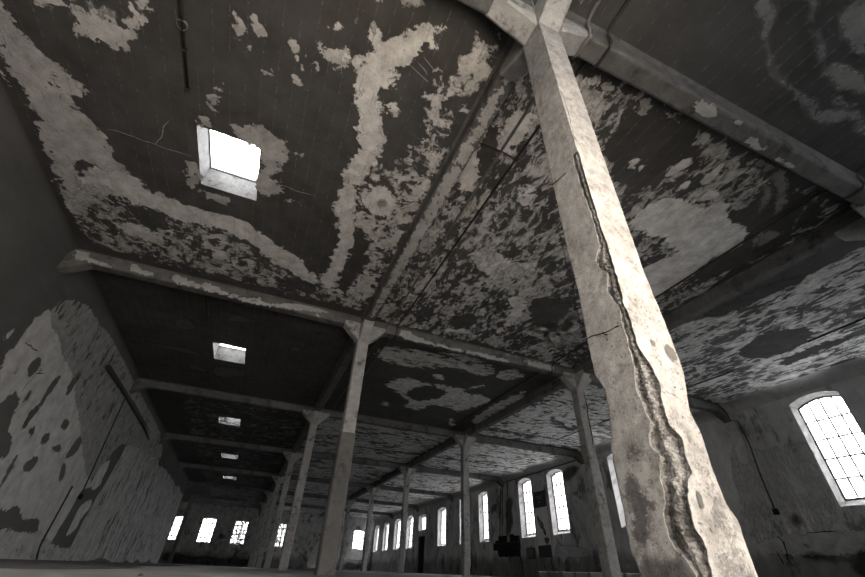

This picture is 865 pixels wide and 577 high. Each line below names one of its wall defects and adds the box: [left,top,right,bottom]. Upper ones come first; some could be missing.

peeling [0,299,183,563]
peeling [0,0,589,519]
spalling [573,151,712,577]
peeling [570,63,775,317]
peeling [665,242,865,403]
peeling [779,179,840,248]